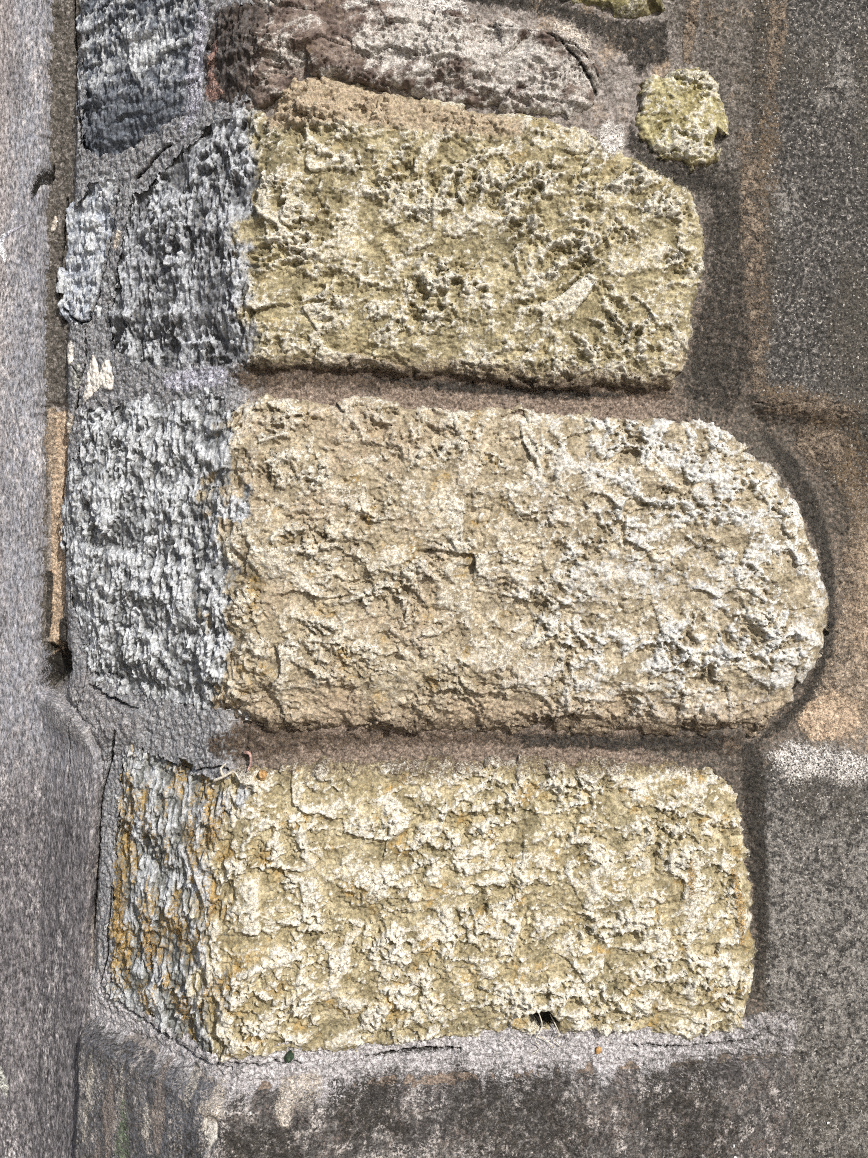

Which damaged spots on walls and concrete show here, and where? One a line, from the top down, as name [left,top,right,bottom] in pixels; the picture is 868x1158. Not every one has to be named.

crack [489,24,599,95]
crack [59,145,172,410]
crack [157,754,229,771]
crack [92,733,116,979]
crack [365,1046,453,1056]